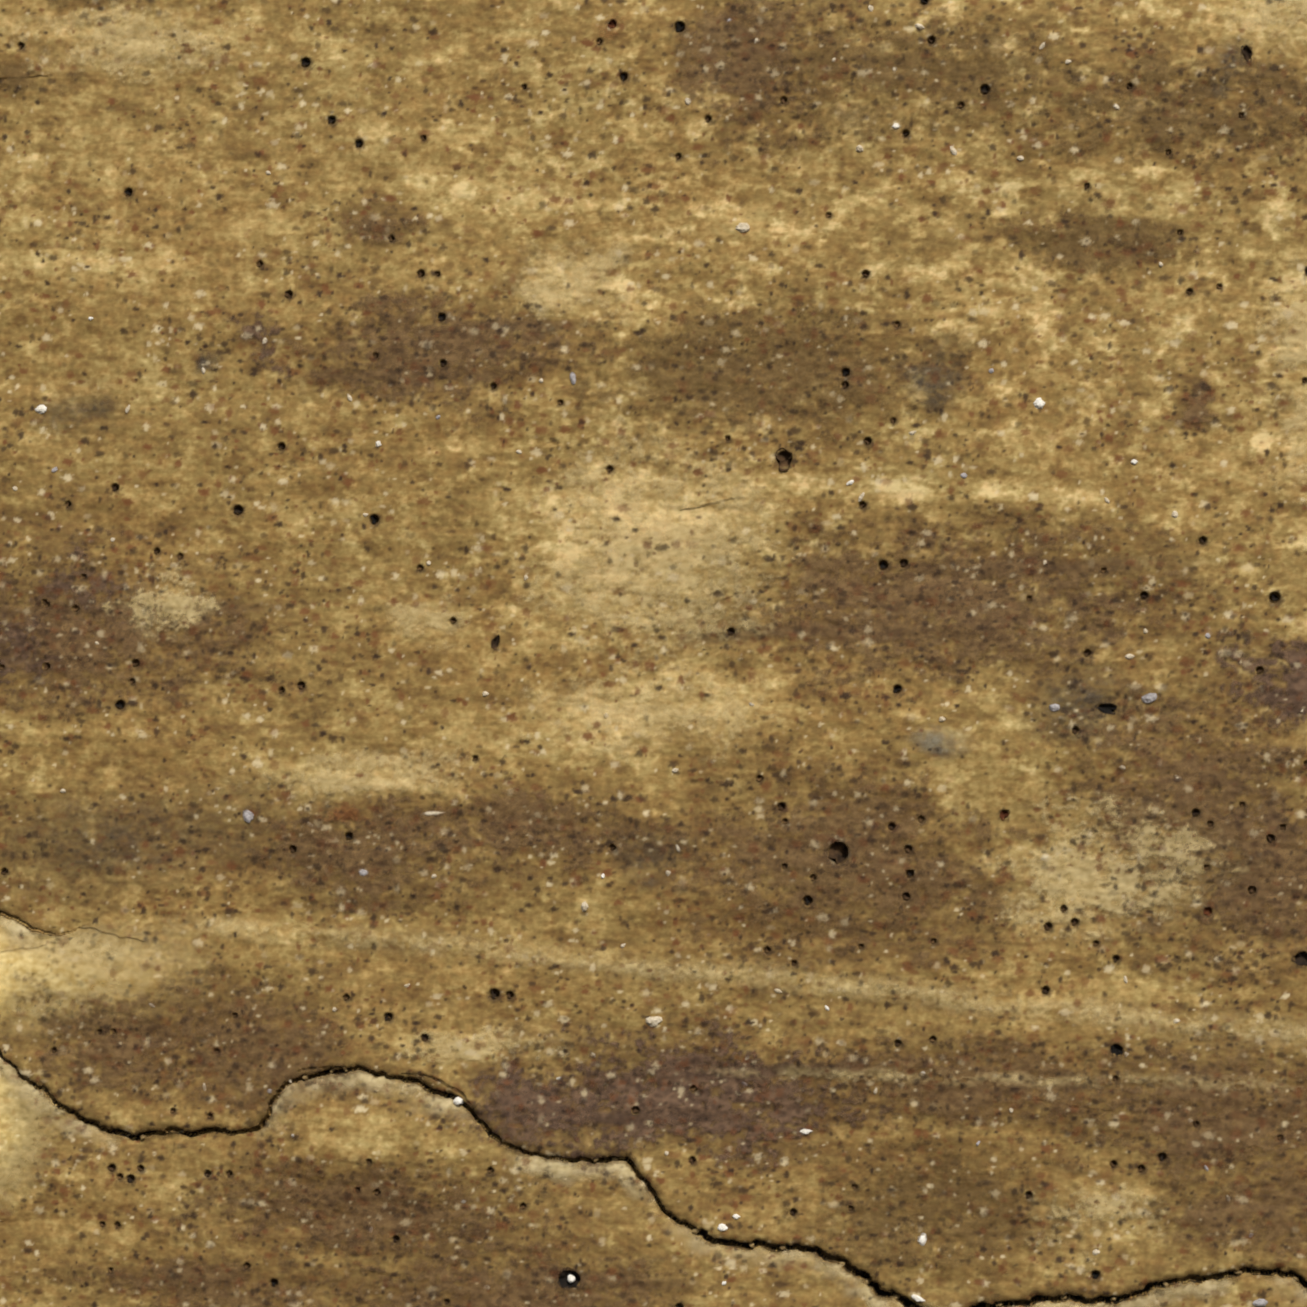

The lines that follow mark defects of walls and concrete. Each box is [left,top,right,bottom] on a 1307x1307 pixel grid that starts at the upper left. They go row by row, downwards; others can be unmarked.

crack [0,911,146,952]
crack [0,1050,922,1307]
crack [972,1263,1307,1307]